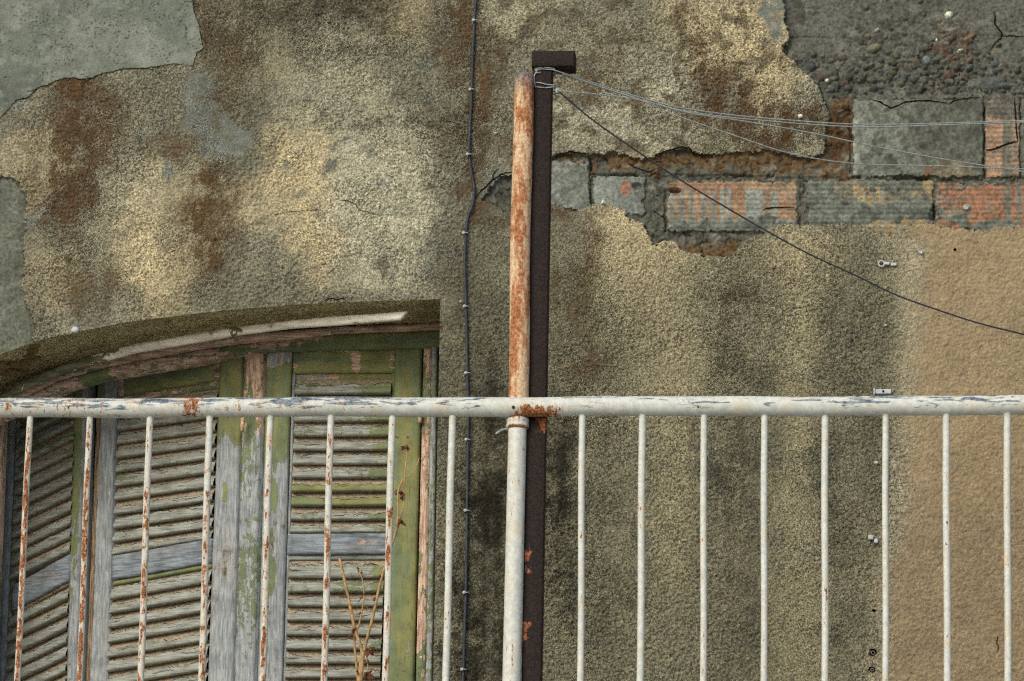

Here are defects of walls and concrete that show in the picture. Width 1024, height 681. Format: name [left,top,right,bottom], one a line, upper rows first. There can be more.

spalling [0,175,41,377]
spalling [482,175,512,214]
spalling [551,0,1024,259]
crack [870,98,969,109]
crack [990,13,1024,51]
damp [546,417,578,590]